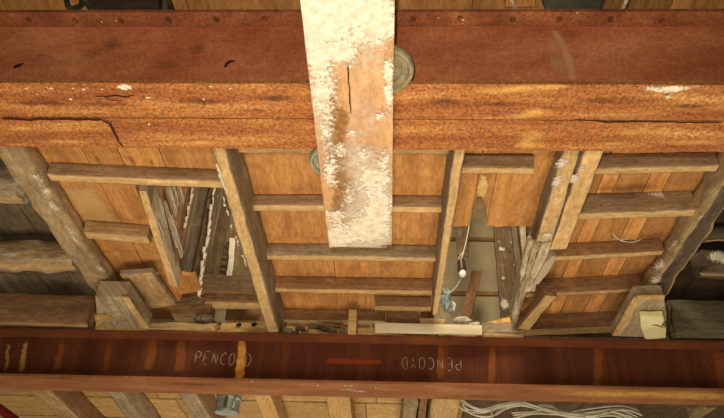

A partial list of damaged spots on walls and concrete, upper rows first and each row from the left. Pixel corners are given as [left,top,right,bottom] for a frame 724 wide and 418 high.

crack [94,94,134,102]
rust [483,85,562,93]
damp [646,86,687,99]
crack [575,117,721,125]
crack [2,118,123,147]
damp [325,95,355,212]
peeling [477,175,488,198]